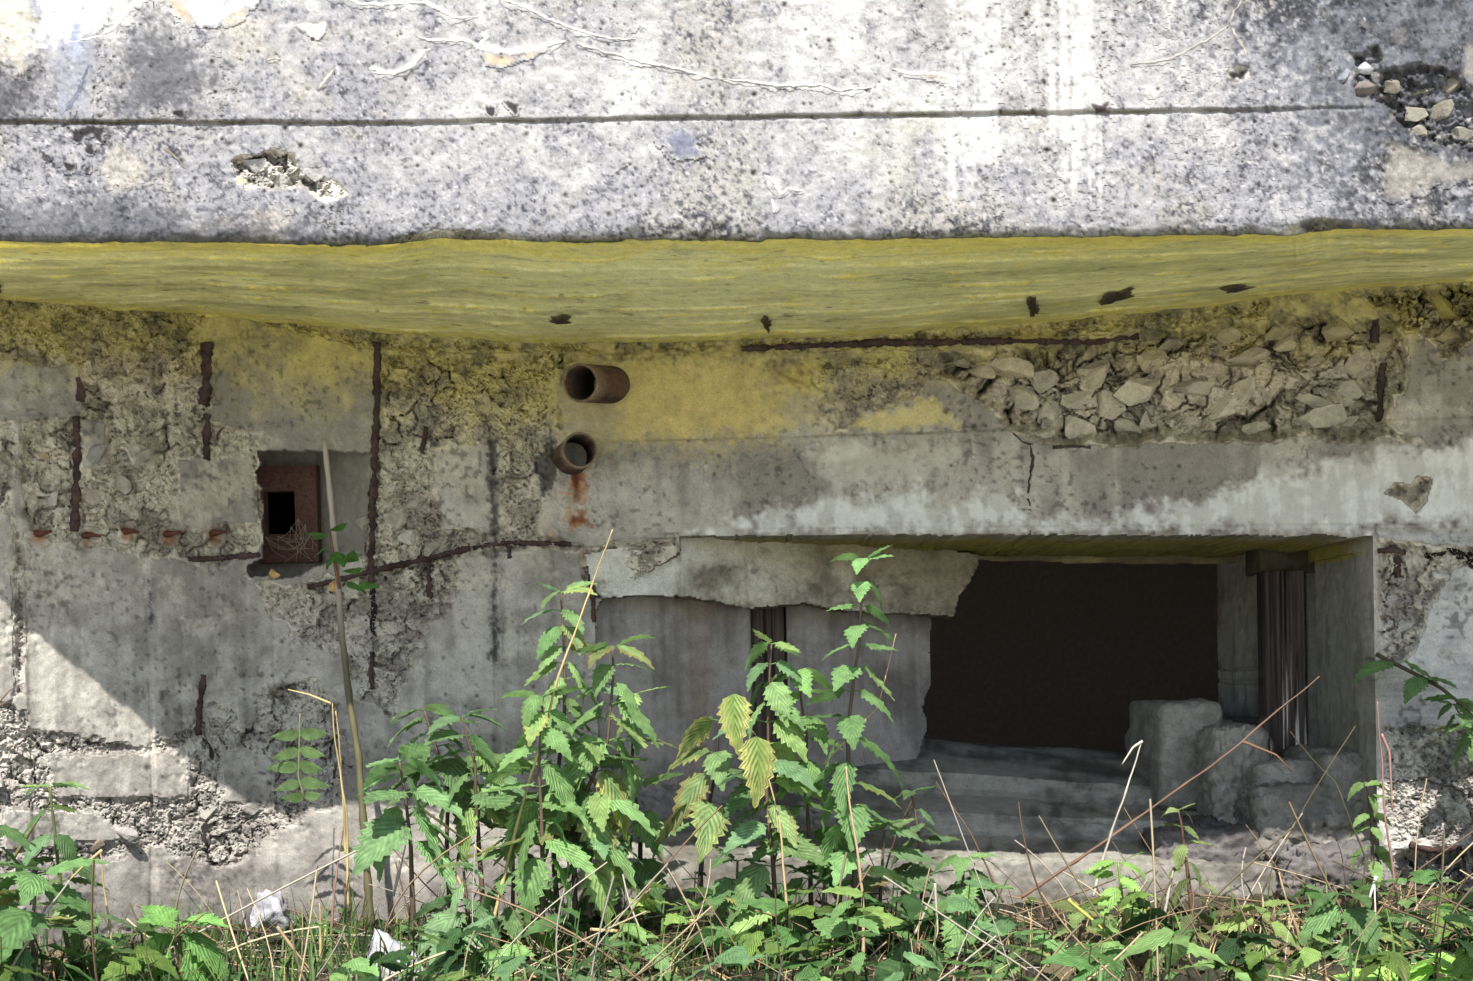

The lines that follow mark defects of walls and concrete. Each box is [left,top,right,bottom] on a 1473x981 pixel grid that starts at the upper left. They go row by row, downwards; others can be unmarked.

crack [64,0,263,112]
spalling [229,147,348,203]
crack [318,0,959,96]
peeling [1338,39,1473,204]
corrosion [198,342,214,461]
spalling [617,281,1473,452]
corrosion [306,341,598,622]
spalling [0,299,679,885]
spalling [1373,538,1473,669]